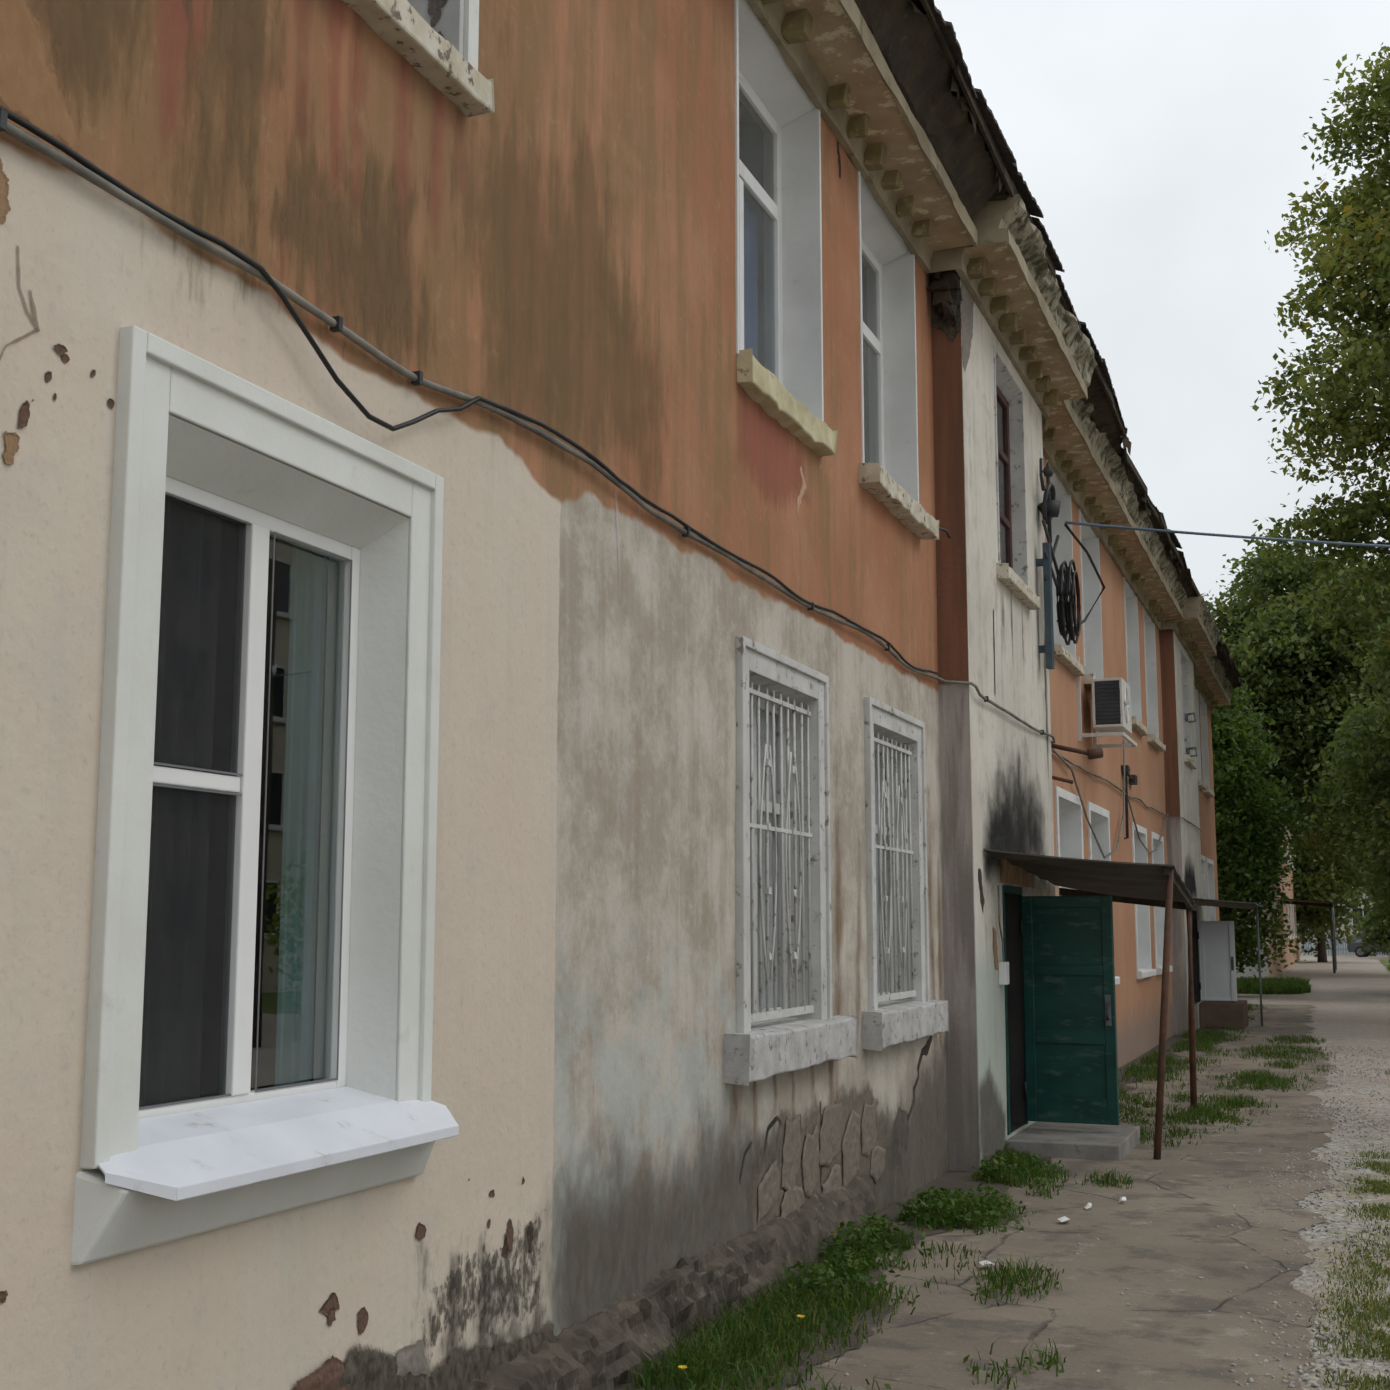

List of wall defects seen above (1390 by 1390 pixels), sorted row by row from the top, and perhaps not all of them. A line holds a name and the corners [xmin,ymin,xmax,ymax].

peeling [0,158,11,224]
crack [0,246,40,360]
peeling [45,344,70,401]
peeling [3,399,34,465]
flaking render [749,1087,887,1230]
water stain [859,1056,947,1214]
crack [894,1036,932,1165]
peeling [416,1222,426,1241]
water stain [423,1117,781,1360]
peeling [319,1293,340,1326]
flaking render [293,1306,554,1390]